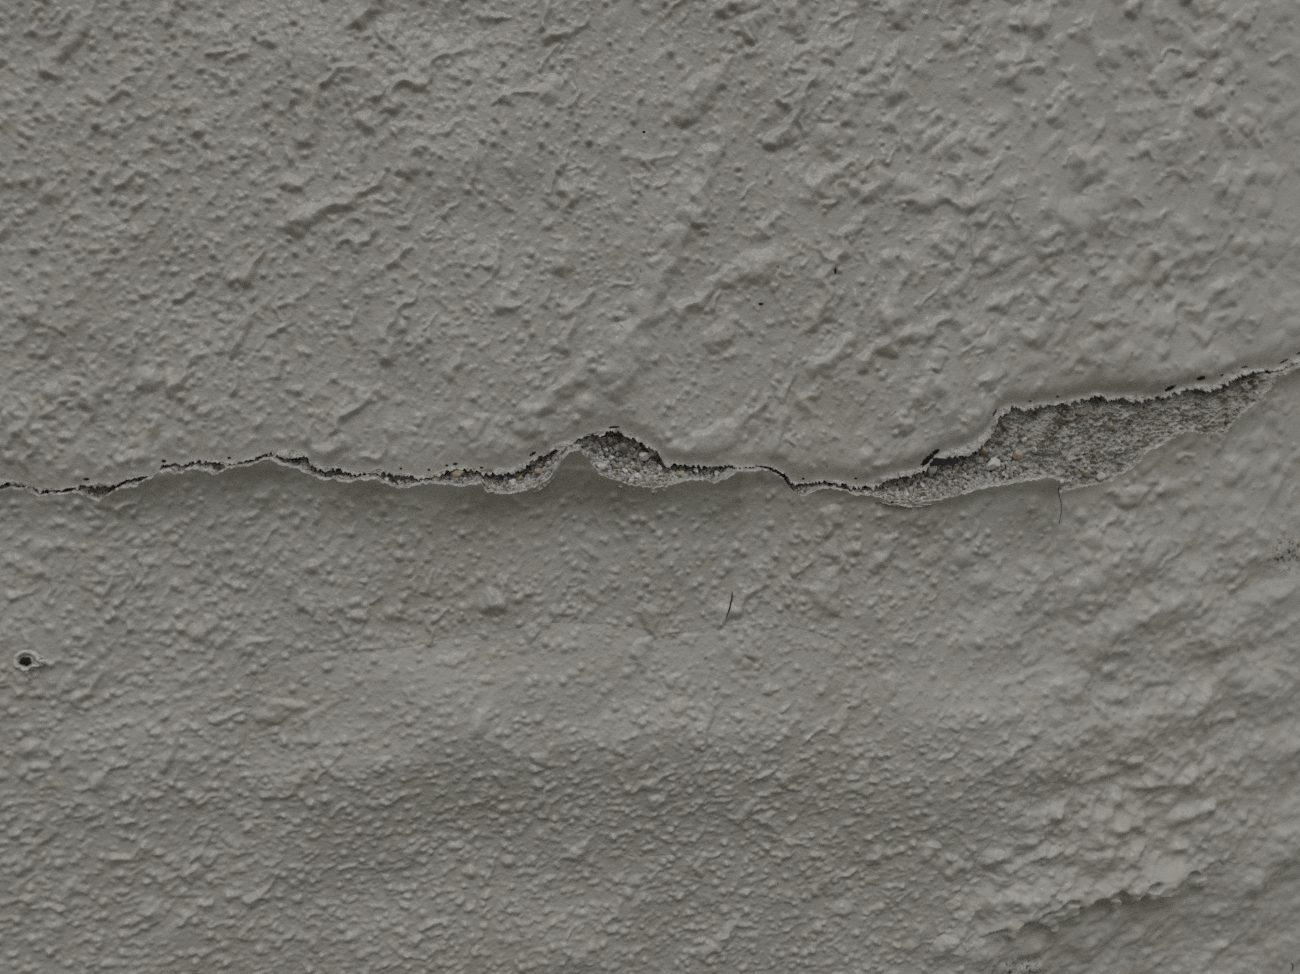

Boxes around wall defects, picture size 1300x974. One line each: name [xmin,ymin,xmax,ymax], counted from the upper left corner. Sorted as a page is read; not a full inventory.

crack [0,335,1300,618]